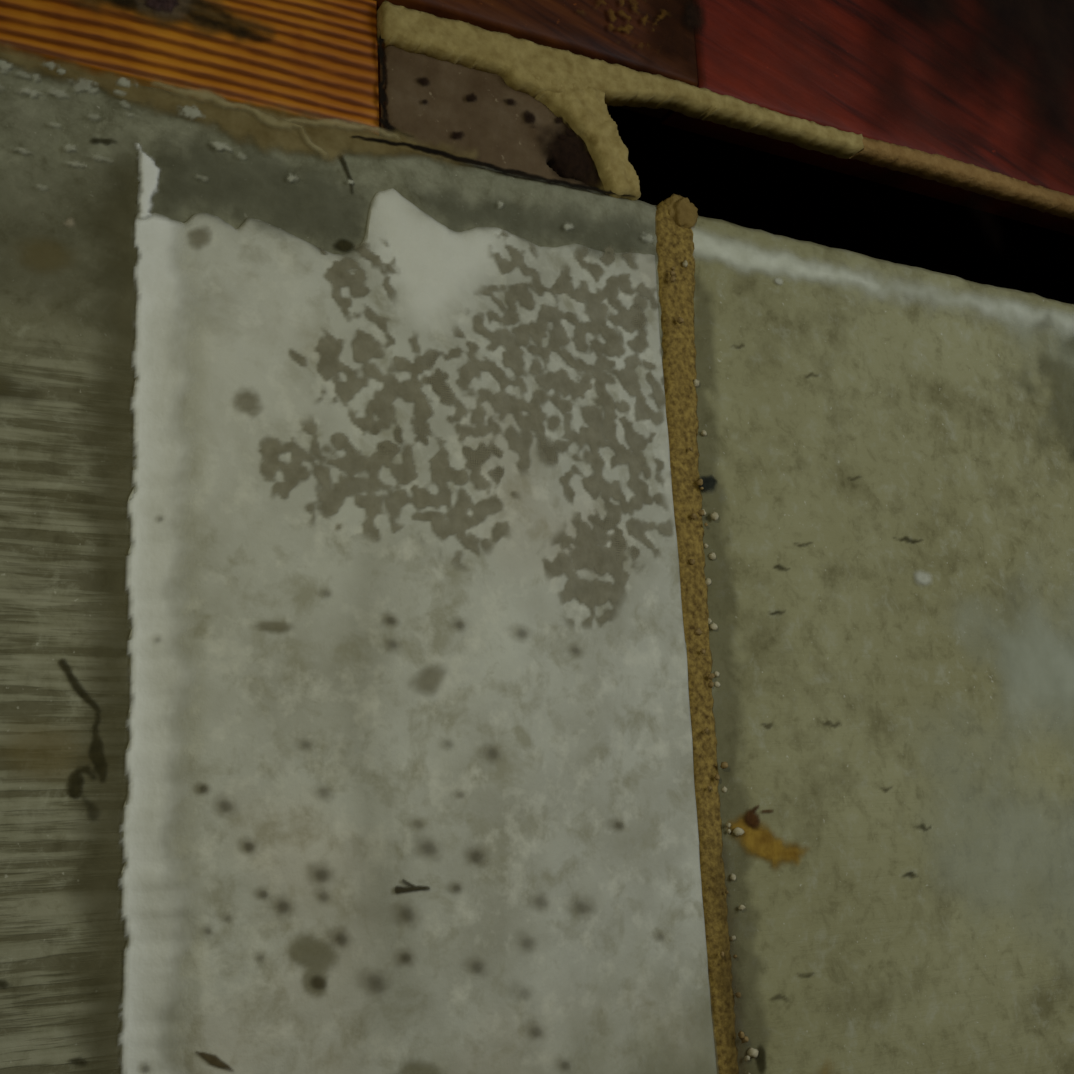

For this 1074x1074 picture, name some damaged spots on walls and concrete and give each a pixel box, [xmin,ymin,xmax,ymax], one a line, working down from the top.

crack [338,31,635,197]
peeling [191,230,208,246]
peeling [237,393,257,412]
peeling [260,232,673,624]
crack [59,659,107,798]
corrosion [730,805,803,866]
damp [293,937,334,993]